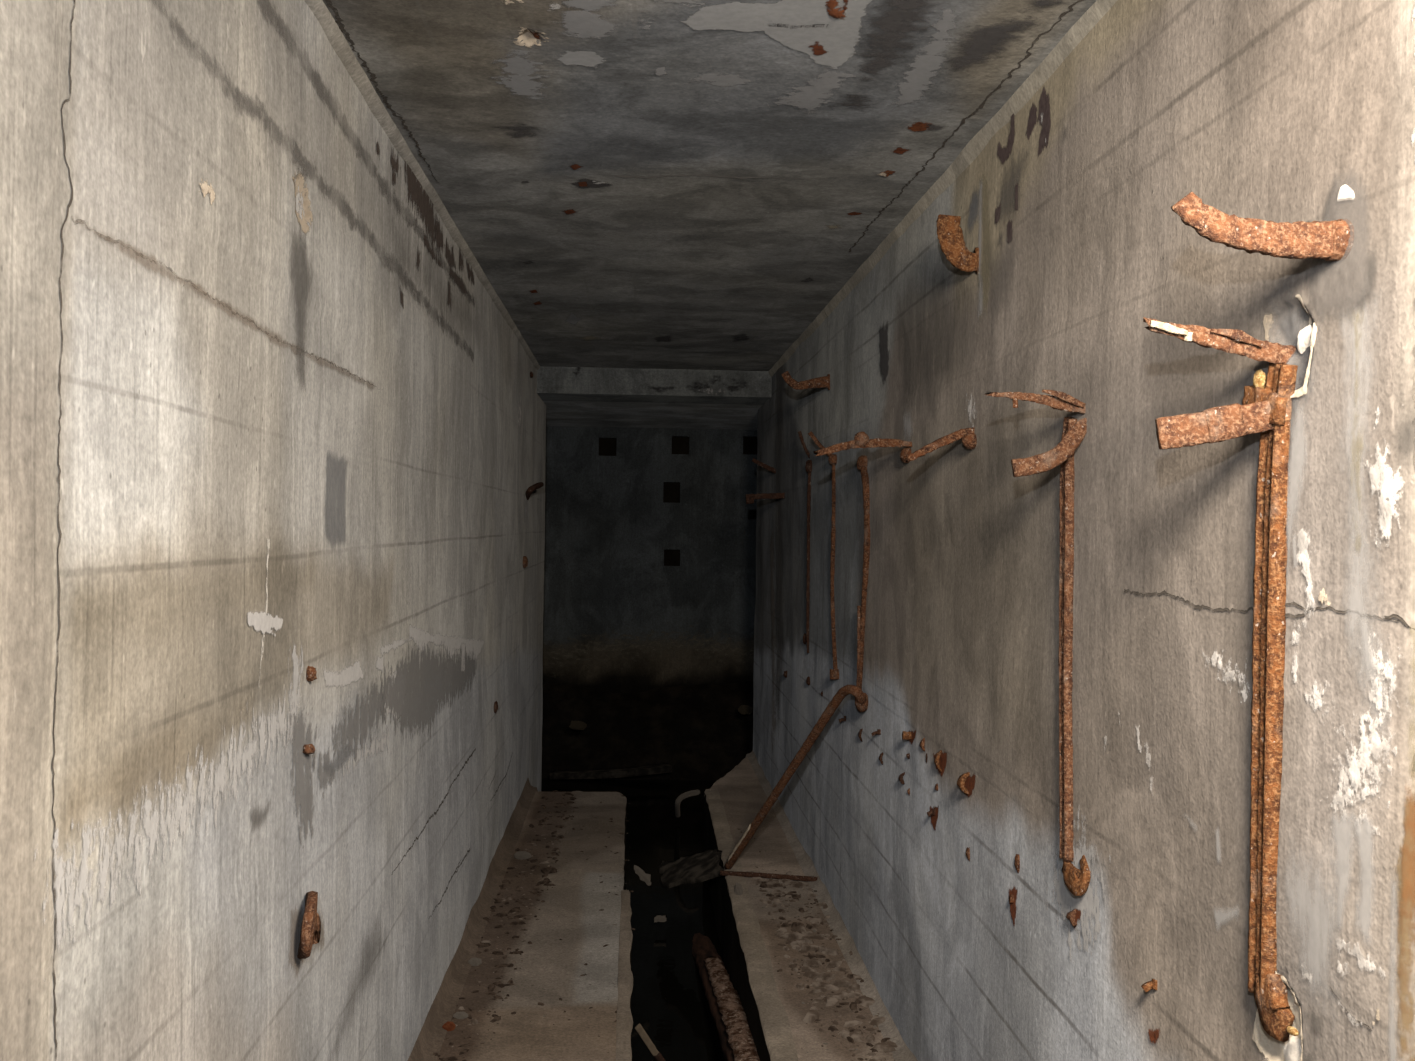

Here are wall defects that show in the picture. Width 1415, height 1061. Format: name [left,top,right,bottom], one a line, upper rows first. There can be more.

leakage [310,70,345,132]
peeling [510,0,617,67]
peeling [654,0,872,113]
leakage [356,142,474,359]
leakage [324,624,484,719]
crack [1124,589,1415,630]
leakage [1287,310,1404,983]
corrosion [930,805,939,831]
corrosion [933,751,976,797]
corrosion [1009,887,1018,926]
corrosion [1390,801,1415,1061]
spalling [1252,971,1303,1061]